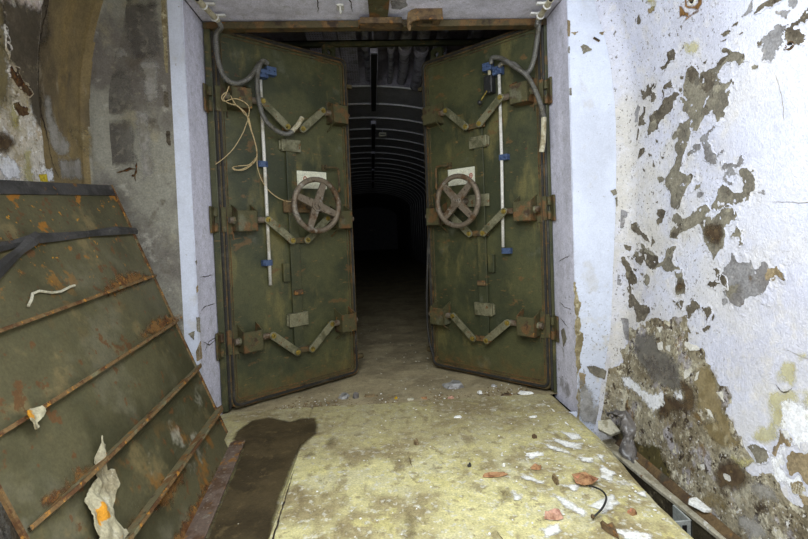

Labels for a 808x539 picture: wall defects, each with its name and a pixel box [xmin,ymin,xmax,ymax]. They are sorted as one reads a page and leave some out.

spalling [3,24,34,118]
leakage [0,0,92,182]
spalling [561,0,808,539]
leakage [207,418,317,539]